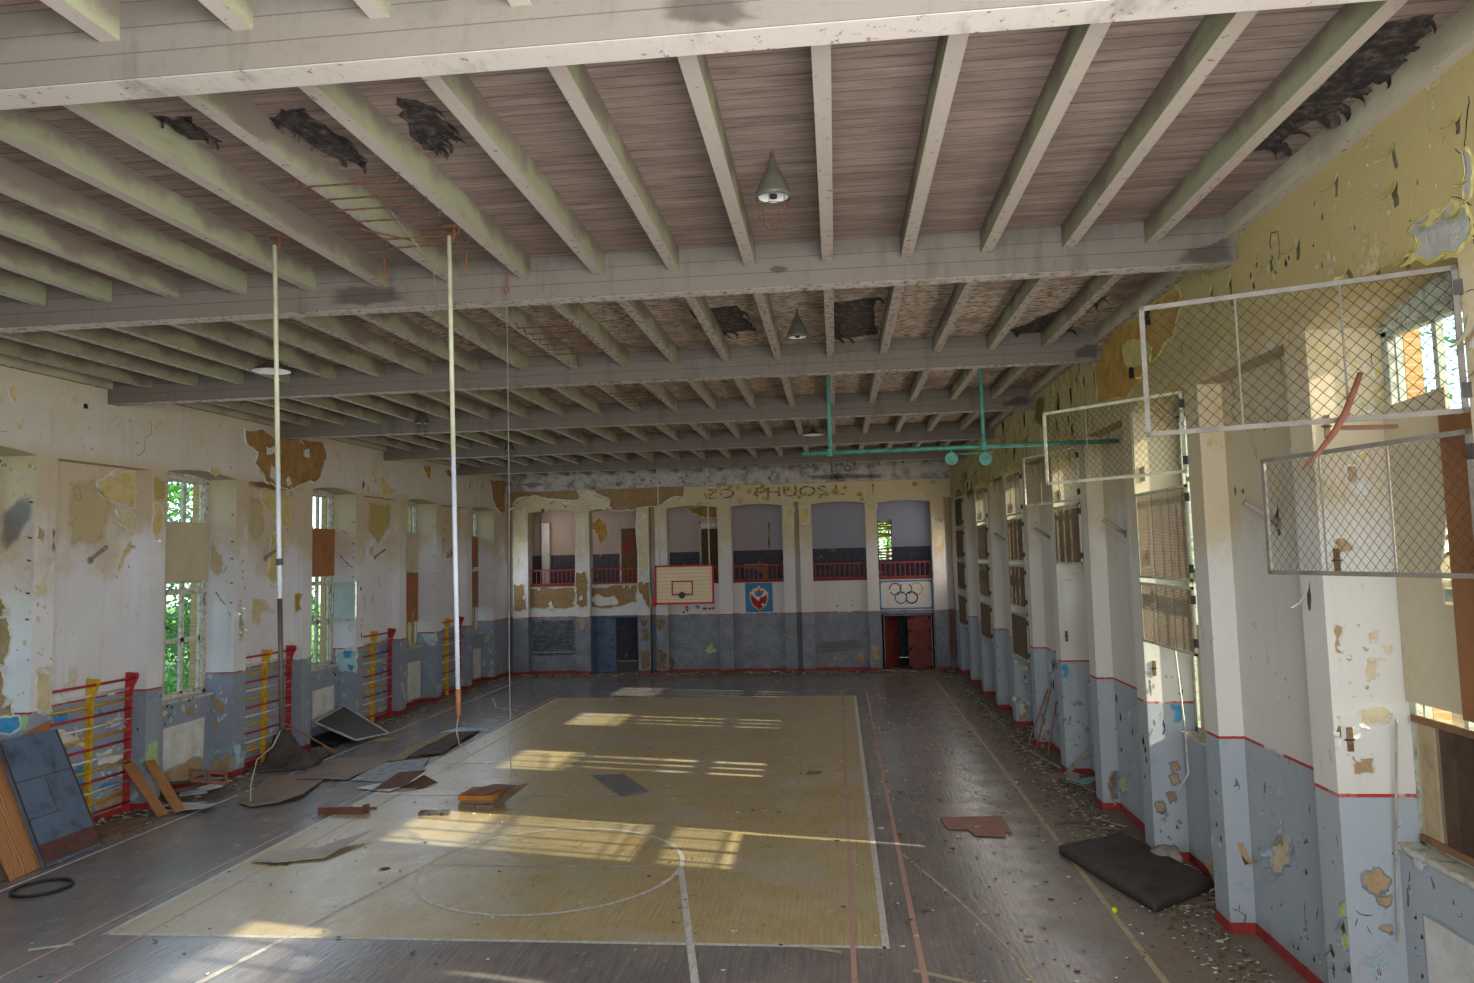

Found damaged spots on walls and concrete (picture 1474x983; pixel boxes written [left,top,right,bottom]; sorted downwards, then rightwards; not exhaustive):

peeling [1366,111,1474,270]
peeling [95,468,164,542]
spalling [236,428,328,642]
flaking render [469,474,882,679]
spalling [1108,670,1186,805]
peeling [1154,761,1182,846]
peeling [1211,789,1308,910]
peeling [1360,867,1394,936]
peeling [1411,913,1474,983]